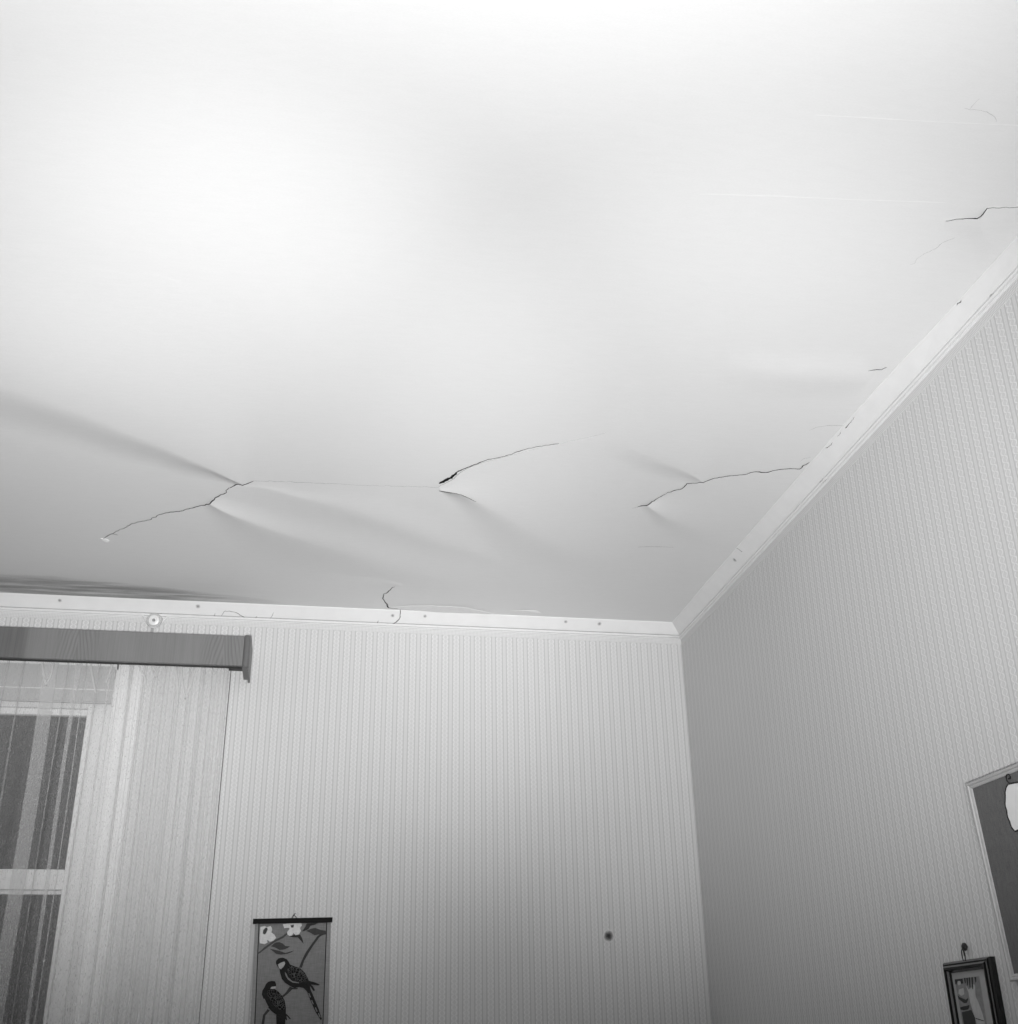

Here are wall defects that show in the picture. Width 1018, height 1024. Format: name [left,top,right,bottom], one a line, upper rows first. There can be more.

crack [101,435,596,543]
crack [635,458,808,508]